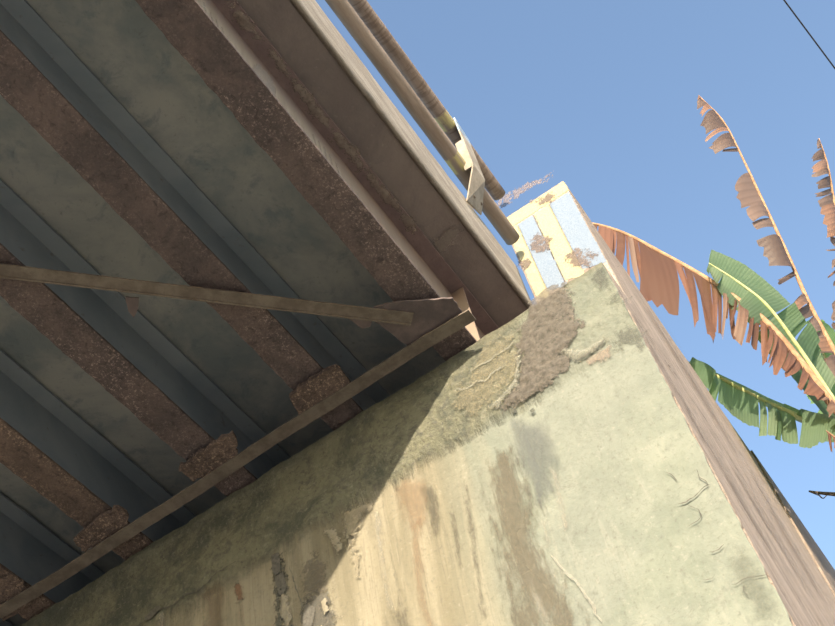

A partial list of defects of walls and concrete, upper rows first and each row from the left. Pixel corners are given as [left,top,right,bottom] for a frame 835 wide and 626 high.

spalling [487,282,611,413]
crack [679,469,710,526]
leakage [322,501,373,578]
leakage [490,449,572,626]
peeling [270,552,342,626]